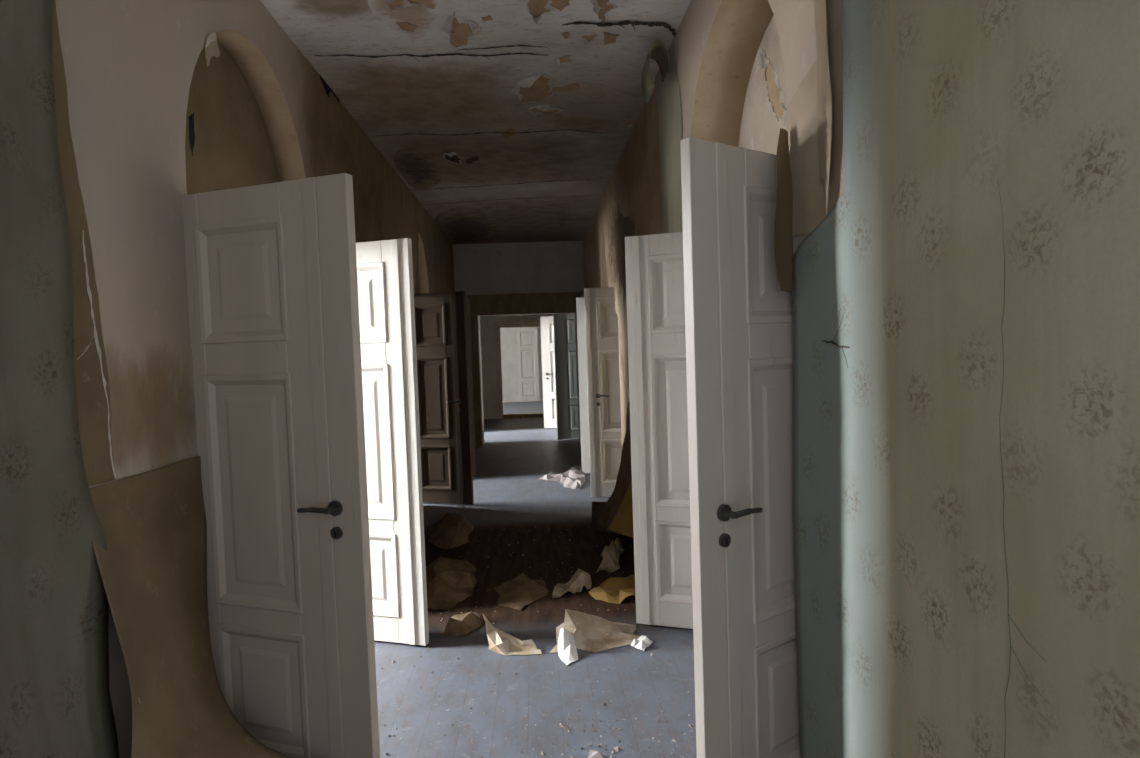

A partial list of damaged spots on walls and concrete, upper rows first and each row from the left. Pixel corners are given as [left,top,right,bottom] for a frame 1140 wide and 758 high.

water stain [277,0,376,23]
spalling [445,11,493,47]
spalling [524,0,570,23]
spalling [561,0,618,46]
crack [562,20,677,38]
crack [315,45,548,102]